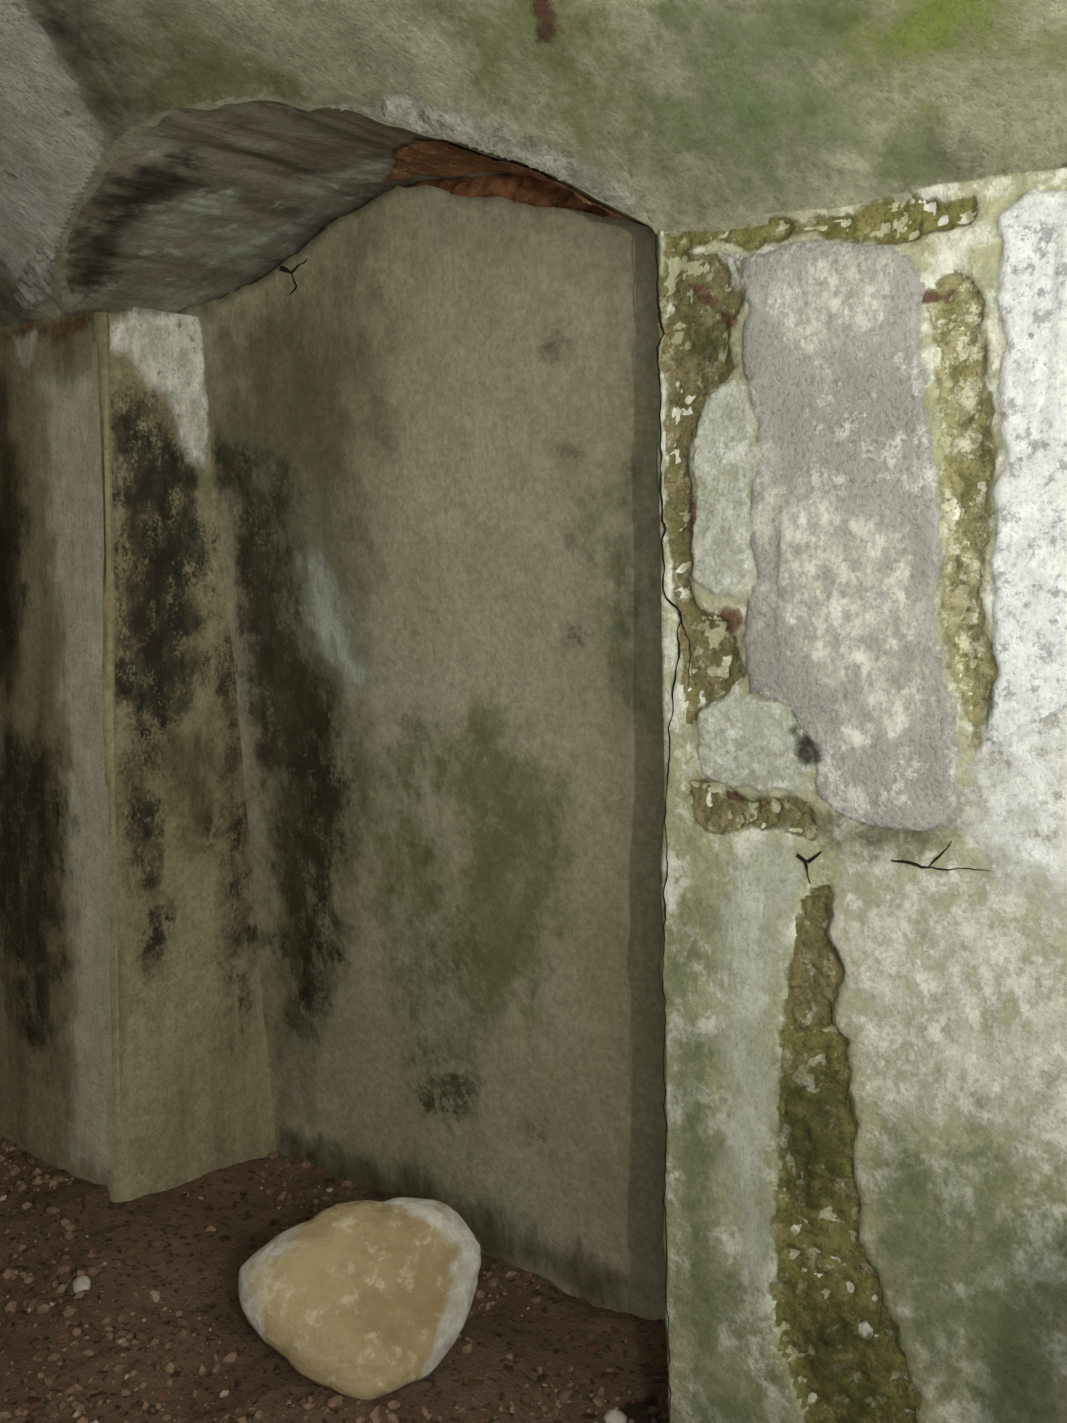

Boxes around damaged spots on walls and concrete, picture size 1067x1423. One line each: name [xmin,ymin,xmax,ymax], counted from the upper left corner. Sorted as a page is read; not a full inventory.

corrosion [534,0,557,43]
leakage [0,310,365,1177]
crack [655,234,691,1423]
crack [796,851,822,884]
crack [891,841,991,871]
spalling [769,885,922,1423]